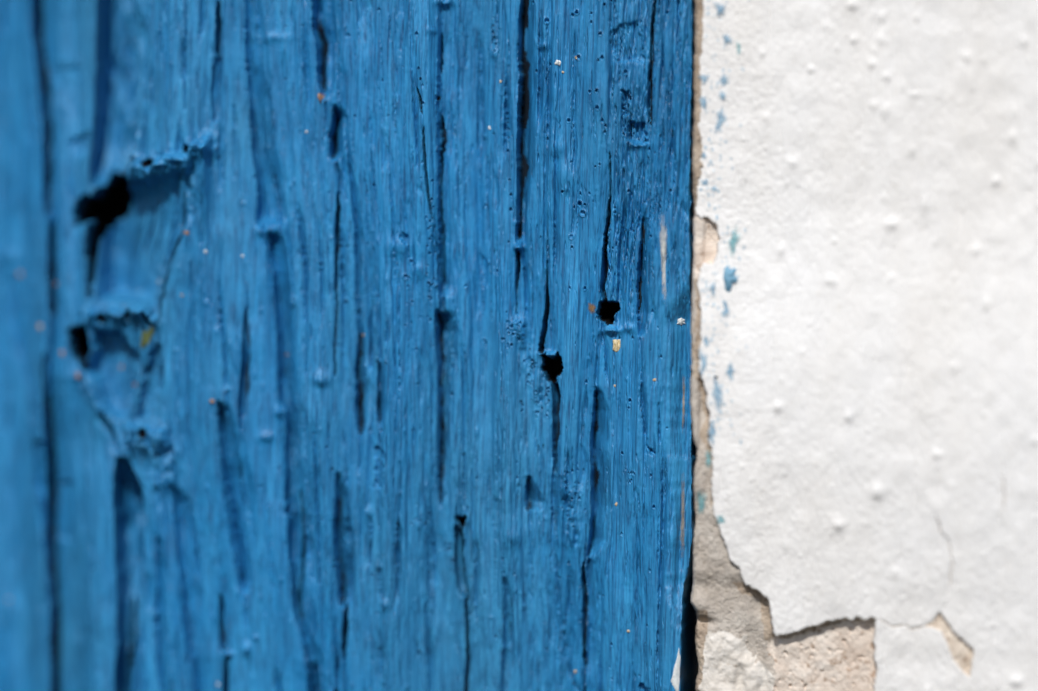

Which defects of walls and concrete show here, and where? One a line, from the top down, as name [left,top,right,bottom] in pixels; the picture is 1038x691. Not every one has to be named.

flaking render [677,0,877,691]
peeling [671,650,681,691]
peeling [926,613,974,677]